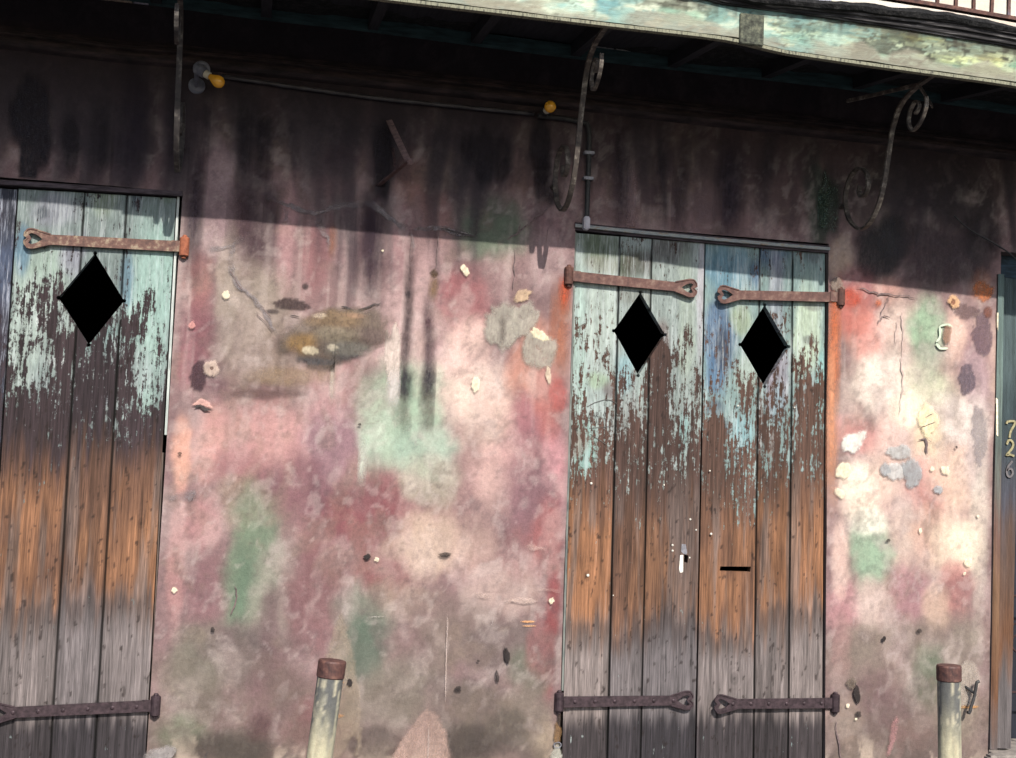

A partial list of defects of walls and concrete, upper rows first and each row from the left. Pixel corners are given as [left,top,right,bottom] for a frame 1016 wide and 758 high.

water stain [10,76,50,178]
peeling [485,289,556,383]
crack [861,288,917,411]
peeling [835,431,866,499]
peeling [881,444,950,488]